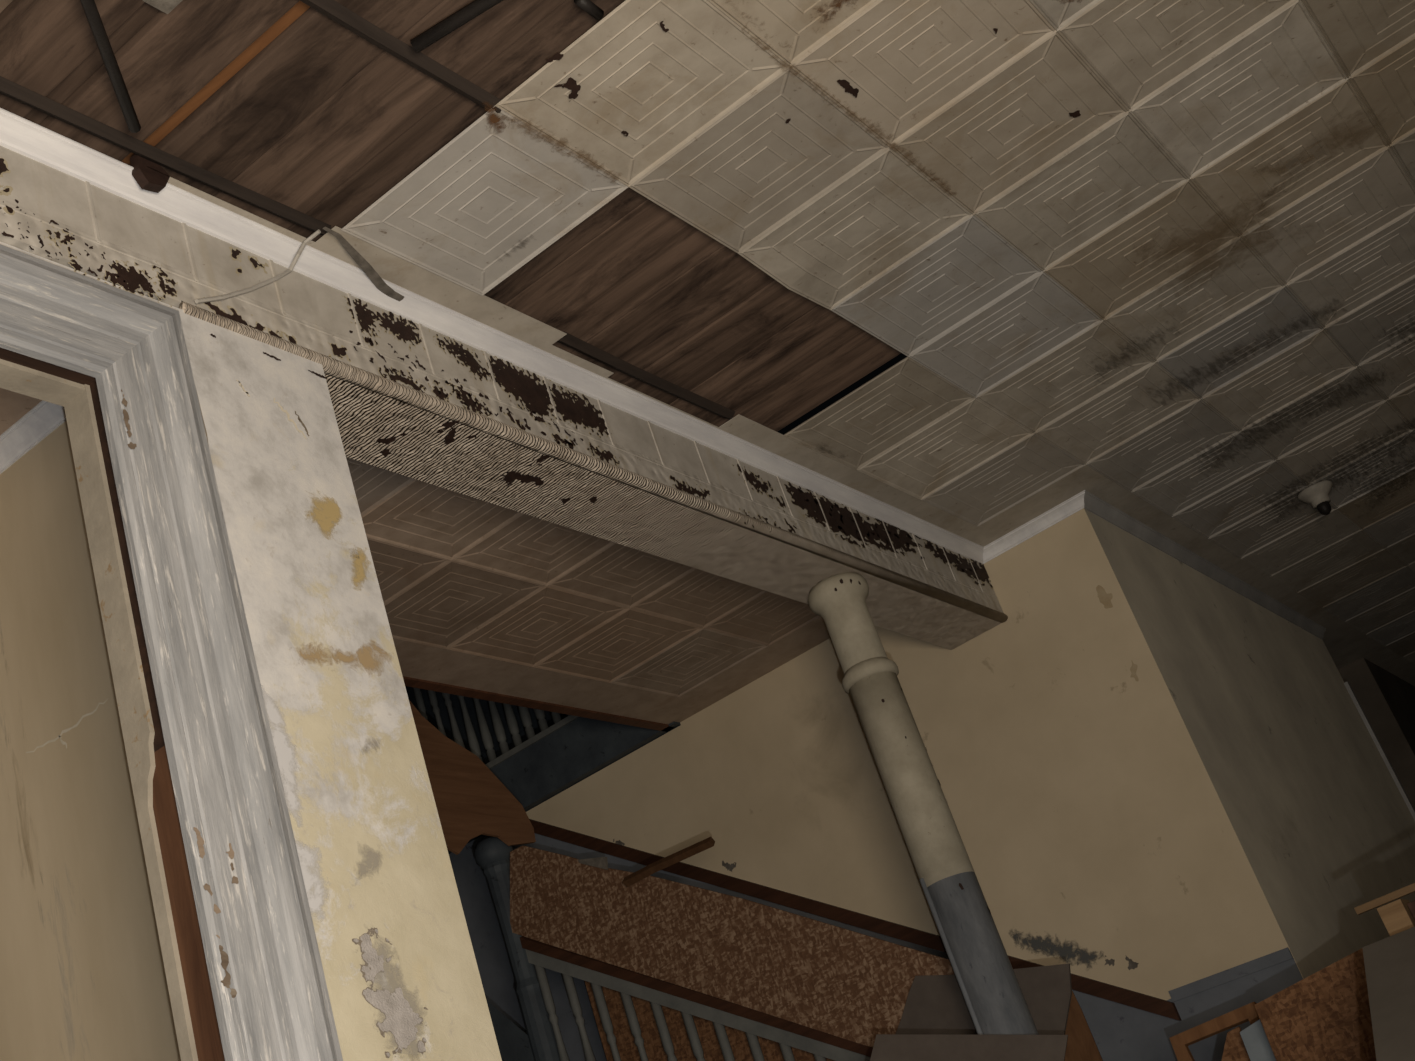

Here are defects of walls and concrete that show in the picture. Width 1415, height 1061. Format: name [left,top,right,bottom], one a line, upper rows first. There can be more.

peeling [0,158,178,307]
peeling [229,246,269,276]
peeling [203,297,297,344]
peeling [121,389,137,449]
peeling [328,296,623,486]
peeling [669,475,710,501]
peeling [732,463,993,589]
peeling [353,550,367,586]
peeling [193,827,205,859]
peeling [226,843,239,884]
peeling [216,935,237,998]
peeling [352,927,428,1058]